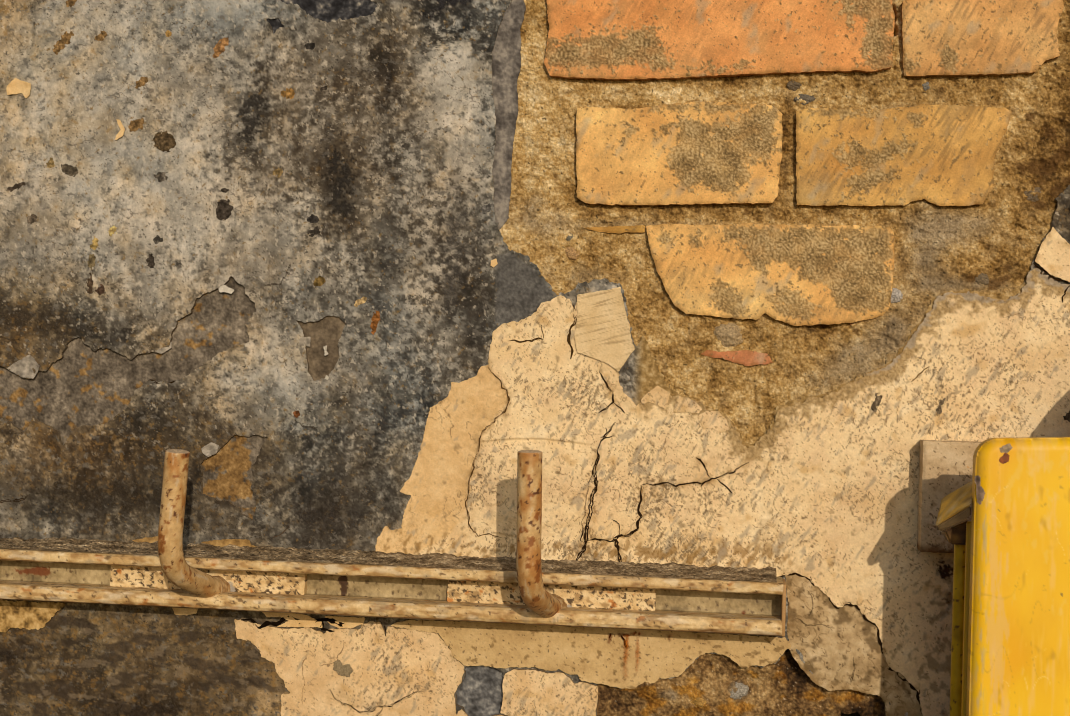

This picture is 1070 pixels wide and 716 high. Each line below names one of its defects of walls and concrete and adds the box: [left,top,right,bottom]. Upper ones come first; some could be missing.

peeling [267,18,284,34]
peeling [281,0,377,23]
peeling [307,214,321,237]
peeling [0,277,256,445]
peeling [298,316,346,381]
peeling [354,297,380,335]
crack [510,305,577,359]
spalling [375,0,1070,716]
crack [465,370,510,537]
crack [576,372,749,562]
peeling [234,612,885,716]